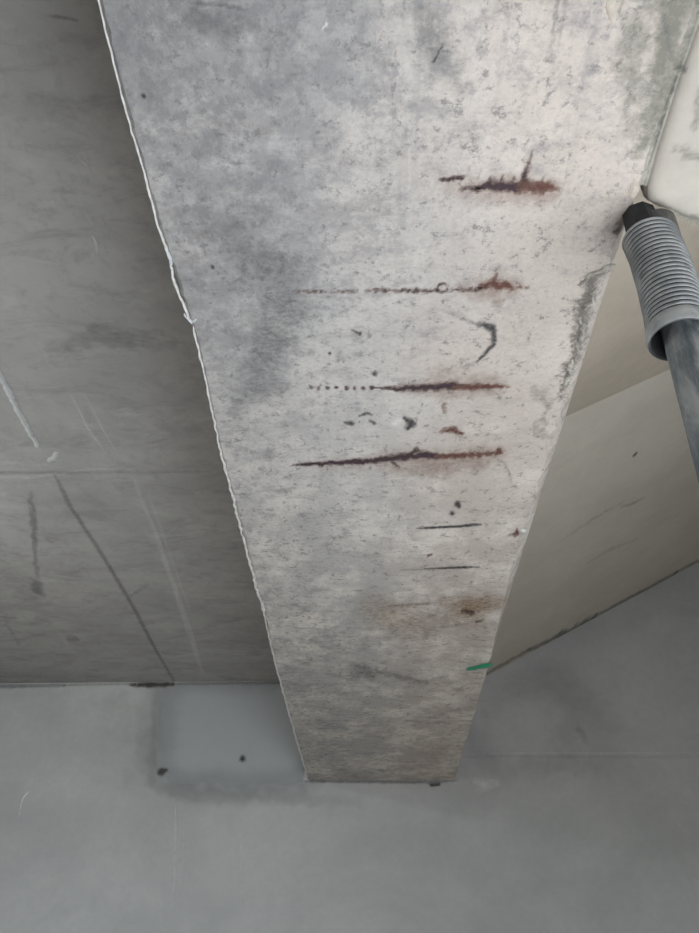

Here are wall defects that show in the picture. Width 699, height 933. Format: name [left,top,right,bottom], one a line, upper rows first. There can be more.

corrosion [440,155,557,194]
corrosion [367,275,527,294]
corrosion [310,381,510,392]
corrosion [295,448,503,469]